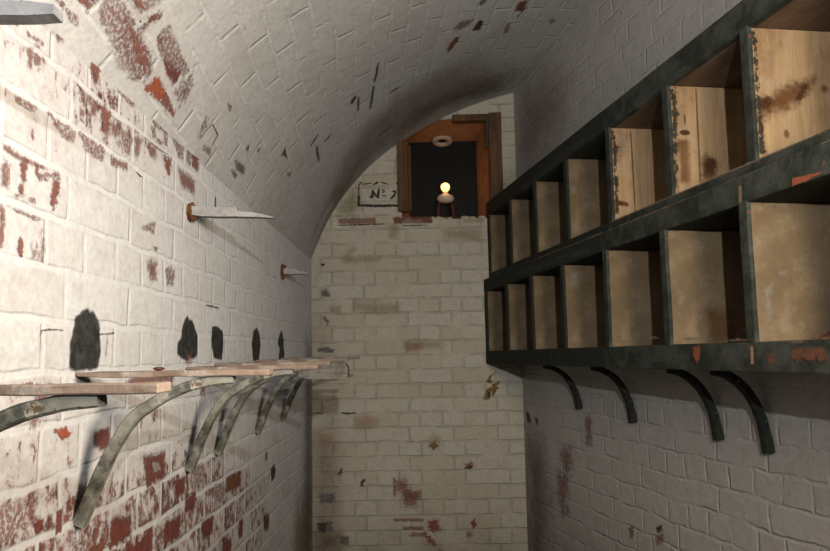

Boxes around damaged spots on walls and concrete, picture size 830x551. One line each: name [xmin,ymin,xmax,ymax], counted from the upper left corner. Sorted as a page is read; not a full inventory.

peeling [57,0,79,26]
peeling [27,31,45,71]
peeling [79,0,194,117]
peeling [16,96,37,111]
peeling [48,90,219,193]
peeling [0,144,60,261]
peeling [55,425,72,440]
peeling [93,428,110,451]
peeling [144,451,166,488]
peeling [214,470,241,503]
peeling [164,464,203,551]
peeling [56,509,153,551]